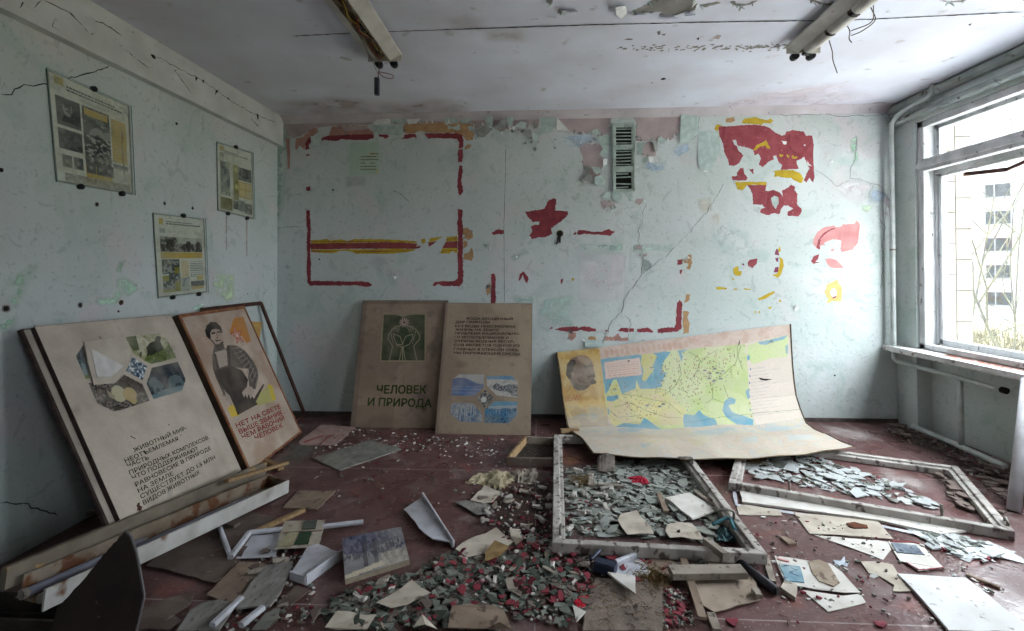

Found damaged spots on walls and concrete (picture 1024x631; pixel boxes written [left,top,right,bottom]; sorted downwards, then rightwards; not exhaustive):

peeling [615,0,787,52]
crack [1,66,108,95]
peeling [283,116,645,213]
peeling [633,115,721,172]
crack [603,184,732,343]